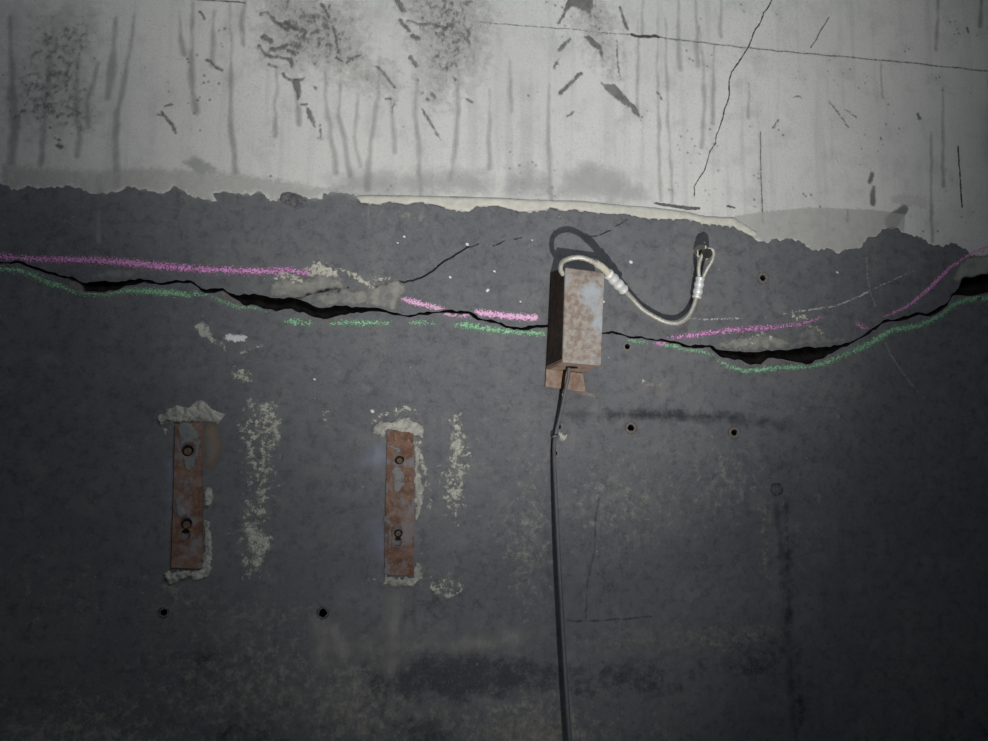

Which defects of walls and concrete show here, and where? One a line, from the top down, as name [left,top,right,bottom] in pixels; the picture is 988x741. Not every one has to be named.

crack [694,0,772,196]
peeling [280,192,307,210]
peeling [357,196,904,251]
crack [757,132,765,213]
leakage [889,205,908,228]
crack [0,237,547,330]
crack [602,274,988,365]
rust [391,465,405,493]